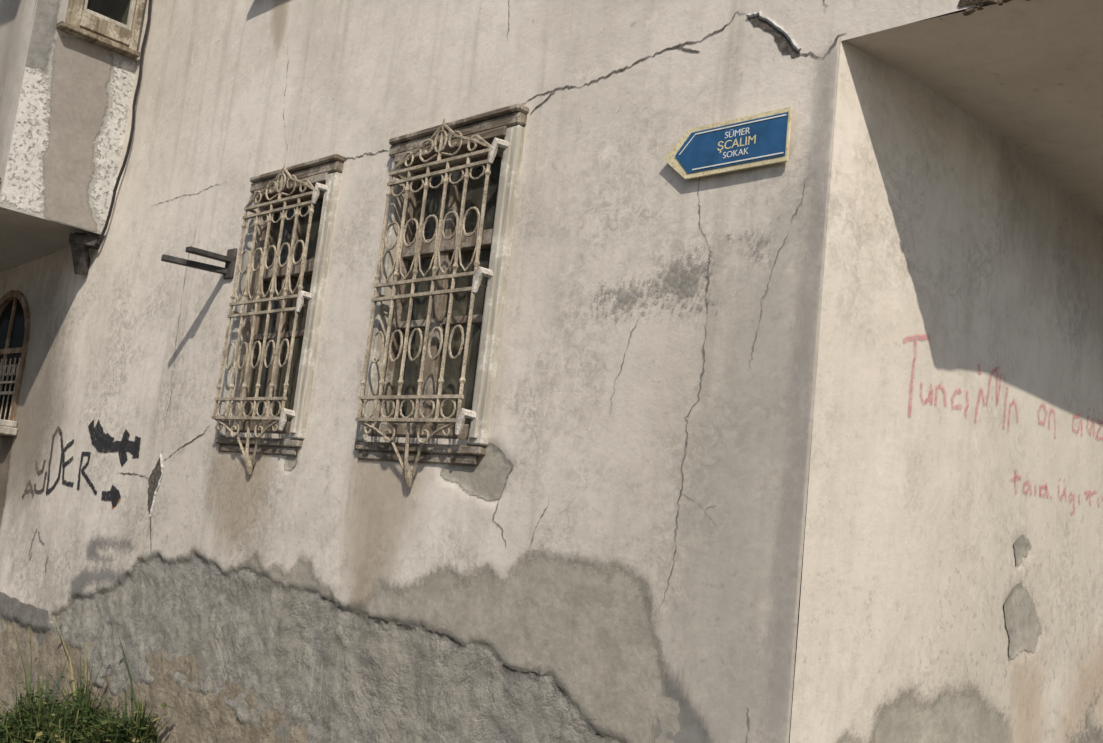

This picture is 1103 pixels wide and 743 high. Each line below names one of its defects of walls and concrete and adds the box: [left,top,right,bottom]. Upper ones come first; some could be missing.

crack [522,11,746,115]
crack [800,0,846,59]
peeling [0,0,136,233]
crack [345,149,390,160]
crack [659,178,716,608]
spalling [440,443,514,501]
spalling [1014,535,1032,567]
flaking render [51,550,688,743]
spalling [1004,581,1043,659]
peeling [838,686,1013,743]